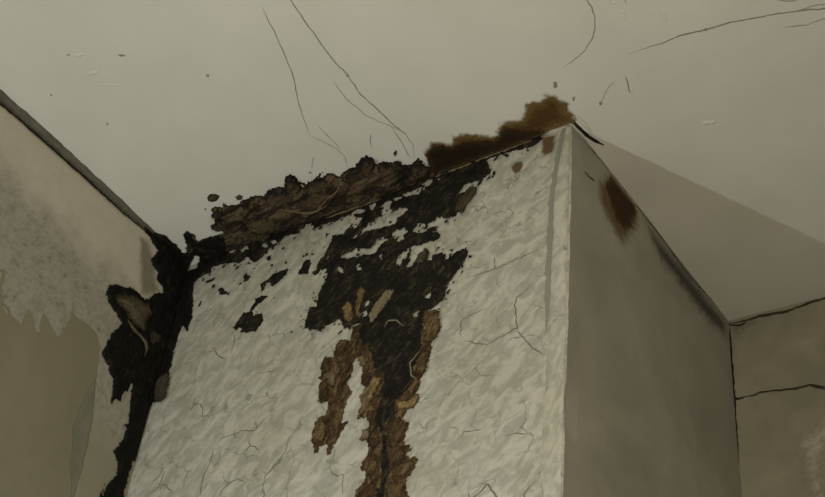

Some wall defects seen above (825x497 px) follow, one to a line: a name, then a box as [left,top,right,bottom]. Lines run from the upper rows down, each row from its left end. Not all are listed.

crack [262,8,347,164]
peeling [205,150,437,242]
crack [290,0,415,159]
corrosion [424,97,575,177]
crack [630,0,825,54]
peeling [0,106,163,497]
water stain [99,135,543,497]
crack [579,132,825,497]